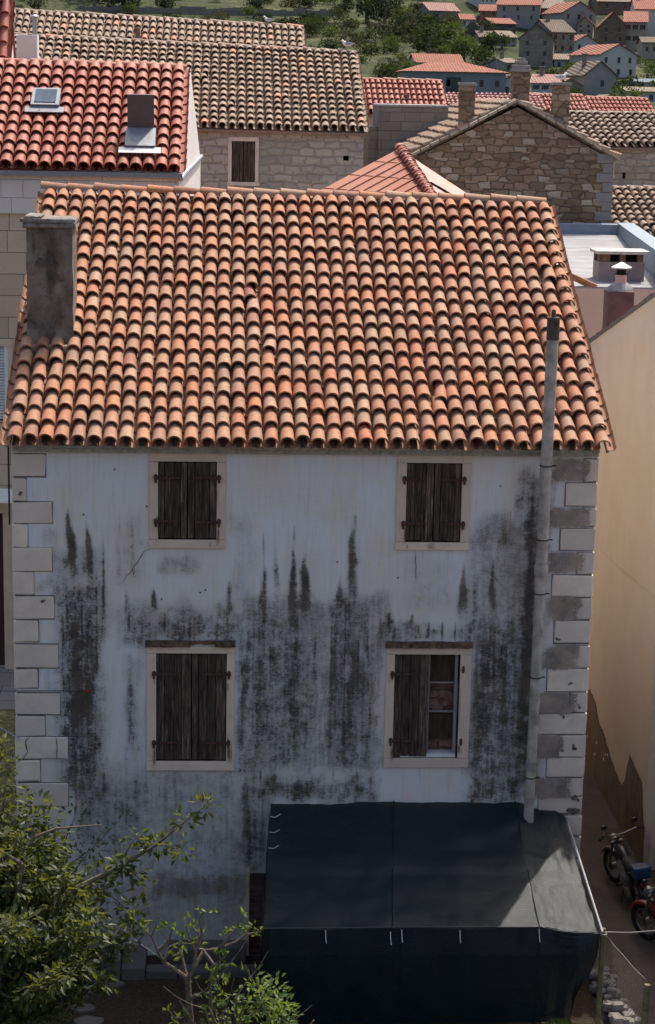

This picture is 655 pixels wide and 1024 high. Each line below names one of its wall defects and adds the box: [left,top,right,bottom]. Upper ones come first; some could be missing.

leakage [56,514,107,816]
leakage [126,586,234,643]
leakage [240,470,549,863]
flaking render [535,637,644,863]